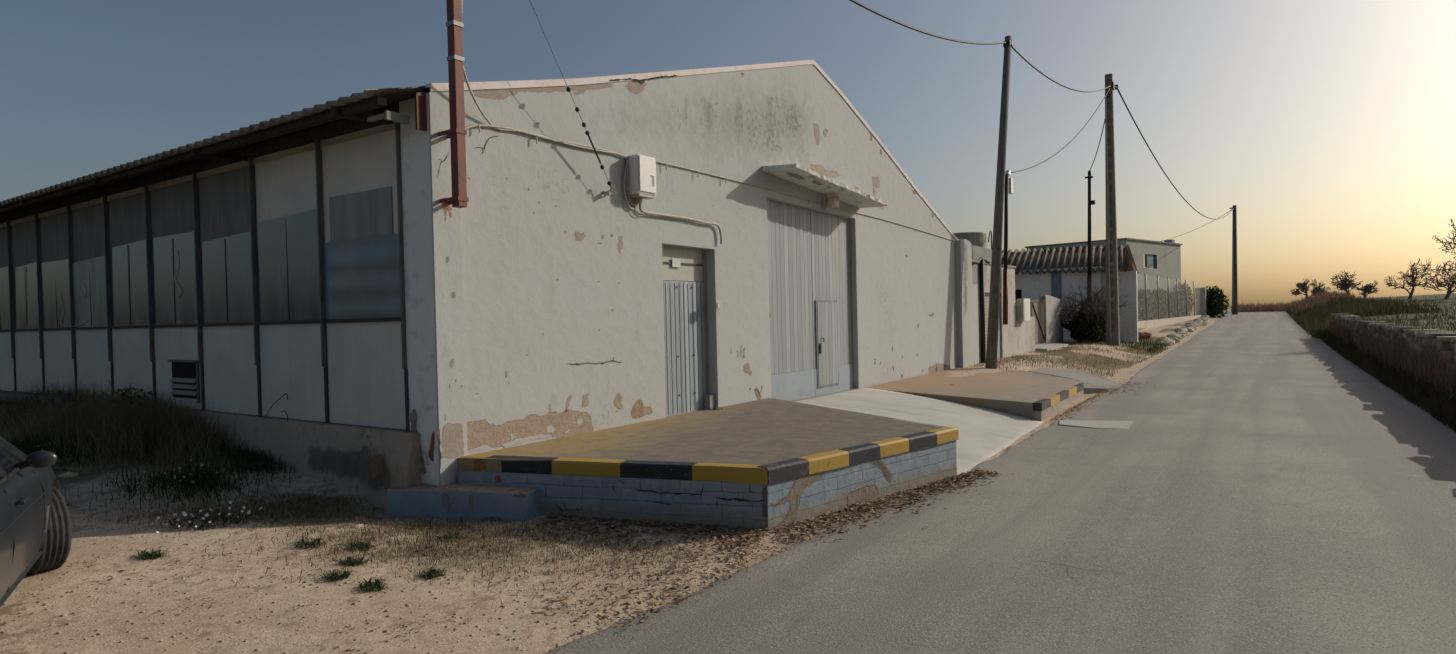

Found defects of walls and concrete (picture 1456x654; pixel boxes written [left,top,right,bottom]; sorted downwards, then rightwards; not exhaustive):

peeling [472,79,646,100]
peeling [409,394,593,475]